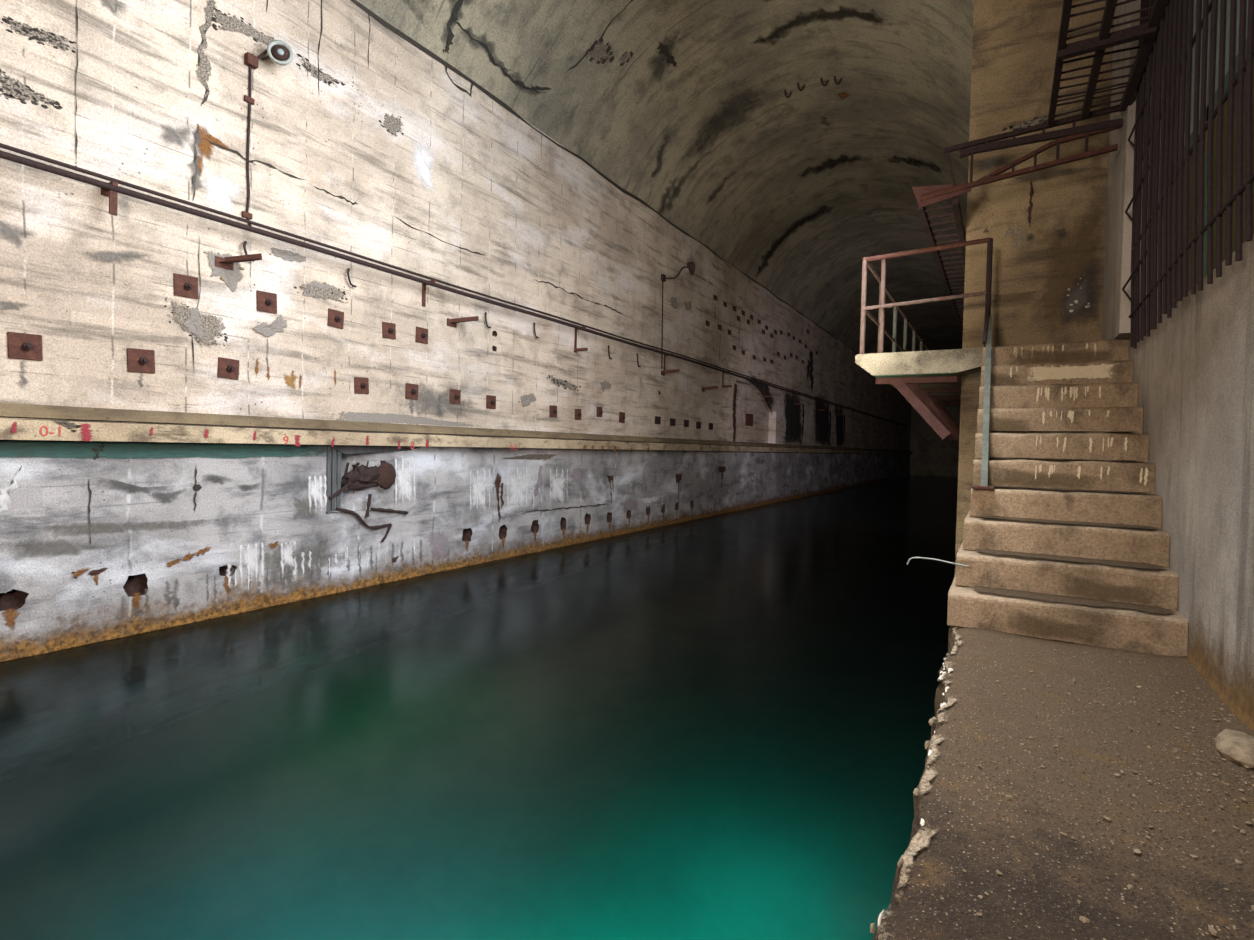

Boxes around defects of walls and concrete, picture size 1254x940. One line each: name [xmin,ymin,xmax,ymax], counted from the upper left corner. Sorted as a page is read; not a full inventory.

spalling [1,16,76,53]
spalling [0,69,63,110]
crack [189,0,358,205]
corrosion [197,125,232,173]
crack [318,0,859,354]
spalling [204,251,245,292]
spalling [294,281,348,303]
corrosion [71,568,108,585]
corrosion [167,547,210,567]
corrosion [2,609,18,629]